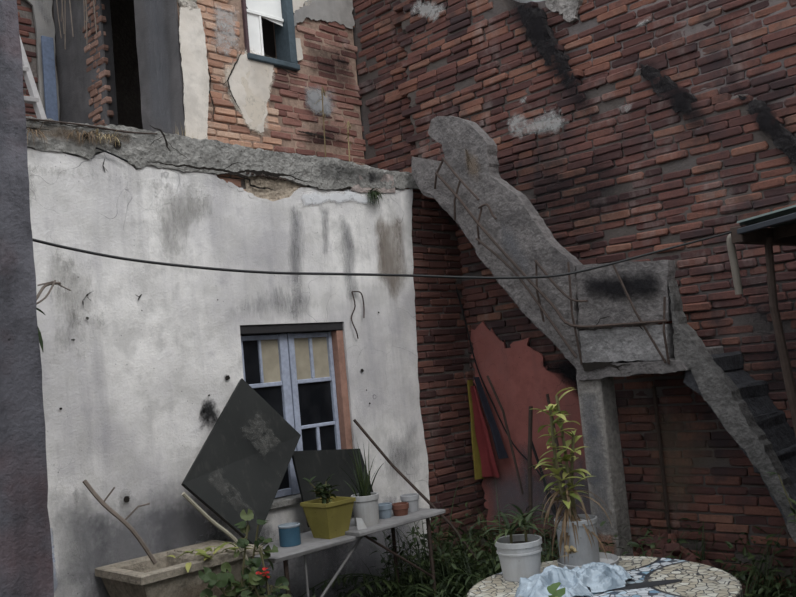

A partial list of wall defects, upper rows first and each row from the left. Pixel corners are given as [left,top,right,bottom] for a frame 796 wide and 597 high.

water stain [377,222,400,290]
water stain [585,274,656,298]
water stain [201,401,218,426]